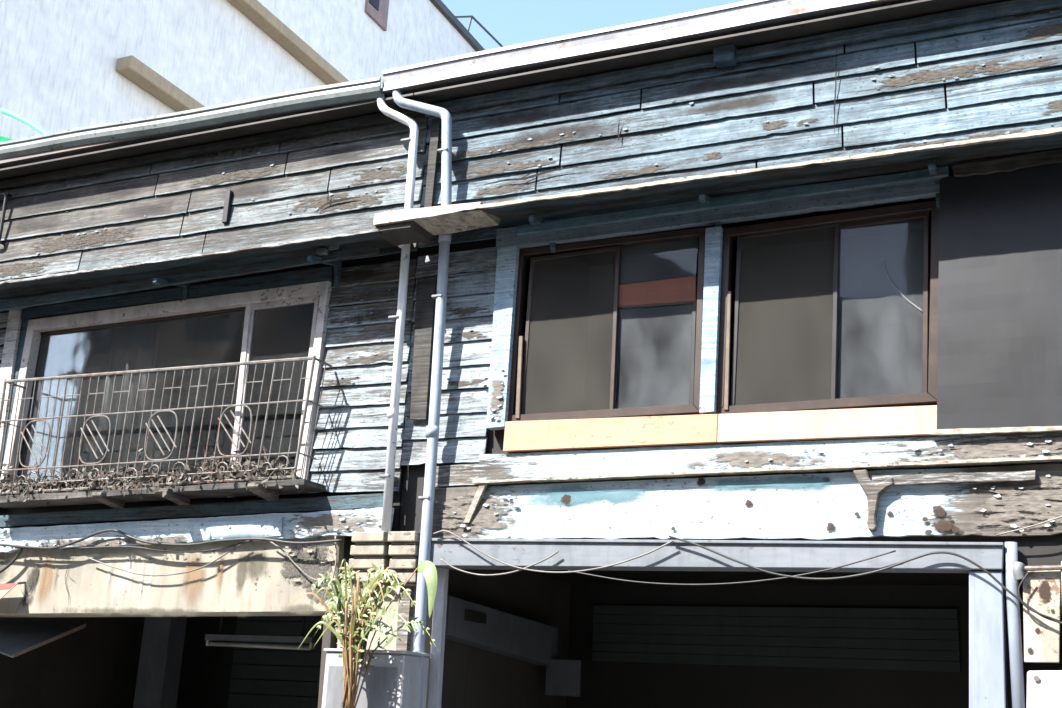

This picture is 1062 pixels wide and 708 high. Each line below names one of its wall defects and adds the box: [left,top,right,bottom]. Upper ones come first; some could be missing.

peeling [1000,7,1062,41]
peeling [870,55,1061,89]
peeling [762,118,817,130]
peeling [686,449,824,471]
peeling [912,437,1062,461]
peeling [435,491,519,537]
corrosion [922,505,964,535]
peeling [972,475,1062,532]
leakage [22,565,38,606]
leakage [236,553,265,588]
leakage [85,608,195,616]
leakage [288,604,313,614]